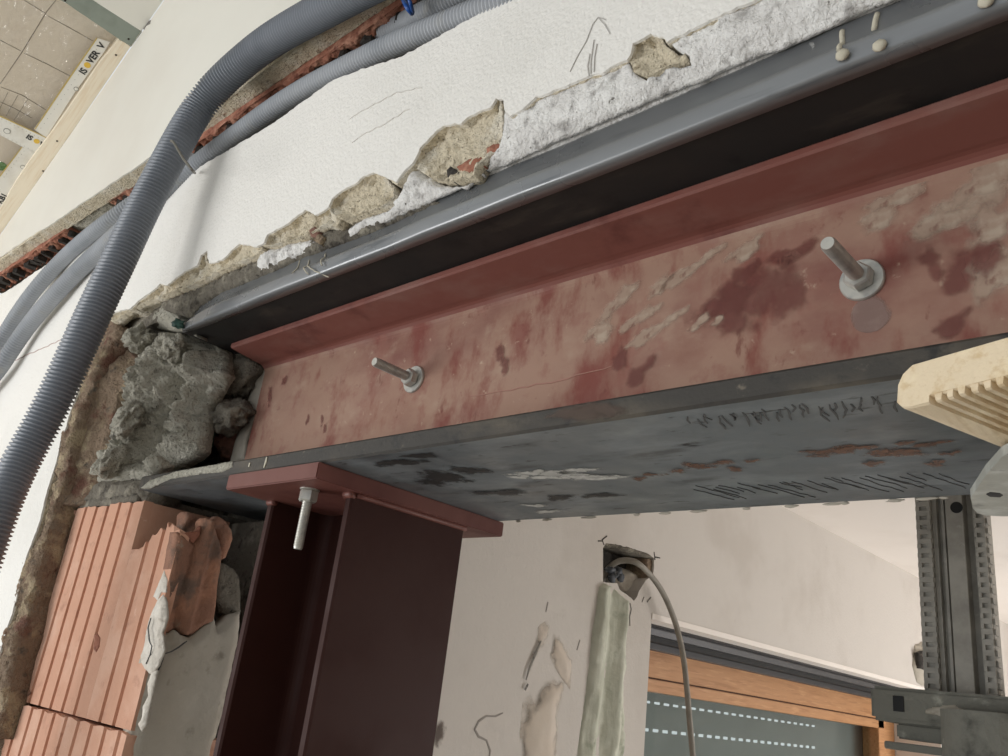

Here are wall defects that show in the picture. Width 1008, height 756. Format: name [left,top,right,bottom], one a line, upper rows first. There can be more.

crack [570,17,610,76]
spalling [630,39,692,81]
crack [350,88,419,143]
spalling [416,101,505,187]
spalling [0,174,402,756]
rust [634,459,759,481]
rust [799,440,961,467]